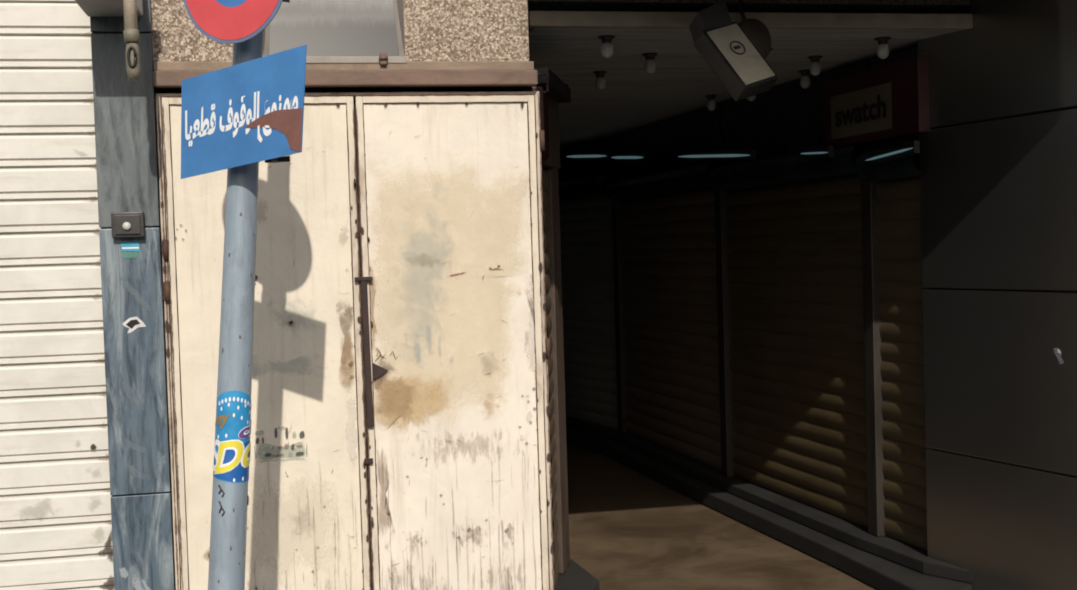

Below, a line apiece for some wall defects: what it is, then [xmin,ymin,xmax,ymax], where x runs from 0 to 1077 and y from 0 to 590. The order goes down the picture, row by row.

rust [304,94,554,590]